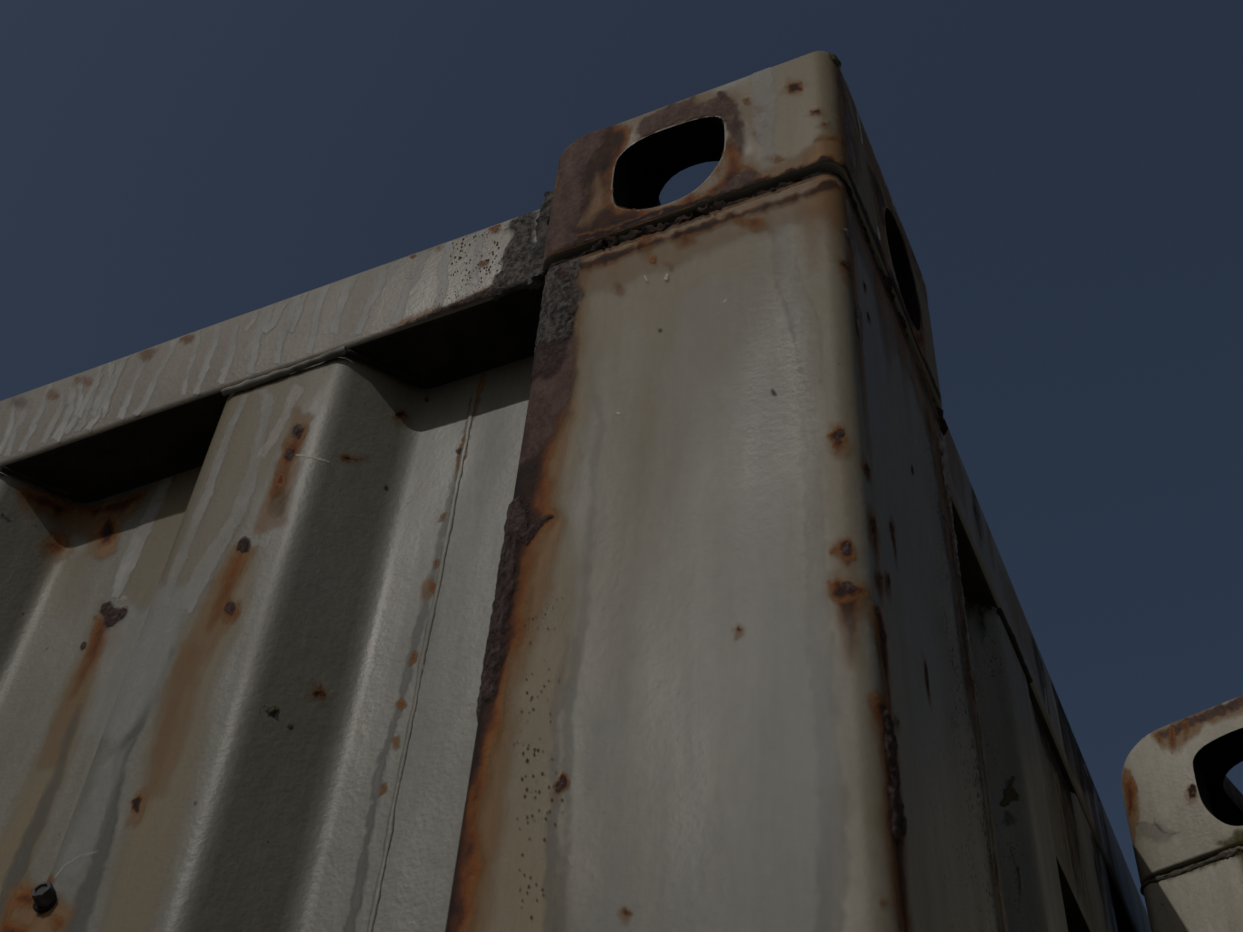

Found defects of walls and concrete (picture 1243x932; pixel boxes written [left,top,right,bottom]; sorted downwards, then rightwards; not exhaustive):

rust [19,488,146,561]
rust [105,536,255,932]
rust [258,408,312,530]
rust [344,490,453,932]
rust [393,52,941,932]
rust [1153,695,1243,747]